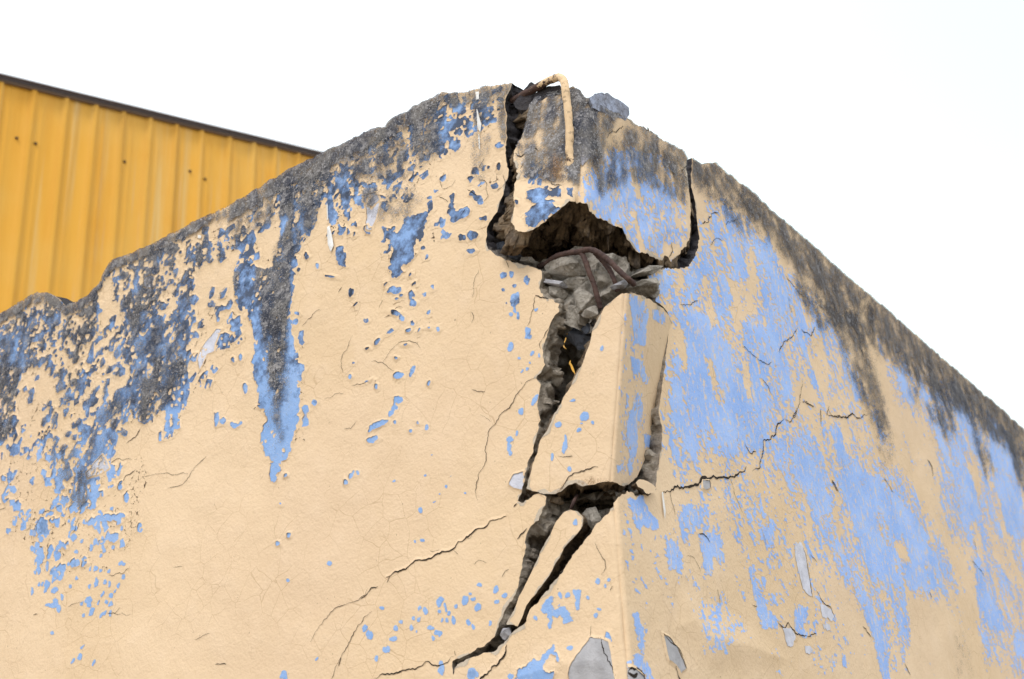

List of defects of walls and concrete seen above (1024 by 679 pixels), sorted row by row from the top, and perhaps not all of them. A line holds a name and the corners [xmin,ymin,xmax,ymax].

peeling [0,73,576,618]
peeling [374,583,482,662]
peeling [438,653,479,679]
water stain [0,82,1024,506]
crack [310,84,865,679]
peeling [489,143,1024,679]